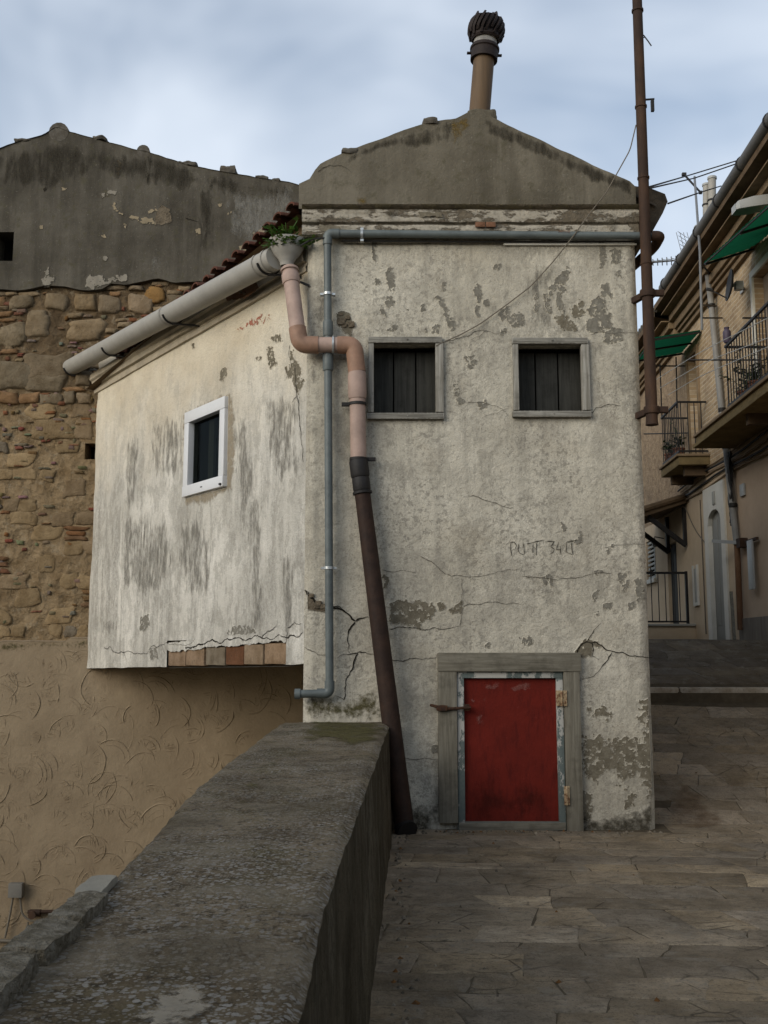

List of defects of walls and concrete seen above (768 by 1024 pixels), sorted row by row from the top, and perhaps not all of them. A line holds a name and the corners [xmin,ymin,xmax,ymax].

damp [567,160,630,192]
peeling [84,255,129,290]
peeling [472,242,625,345]
damp [269,406,295,477]
damp [181,524,208,590]
spalling [149,624,287,666]
crack [105,590,368,700]
damp [235,427,261,627]
peeling [388,599,463,630]
crack [385,544,644,630]
crack [577,621,652,680]
peeling [581,698,652,820]